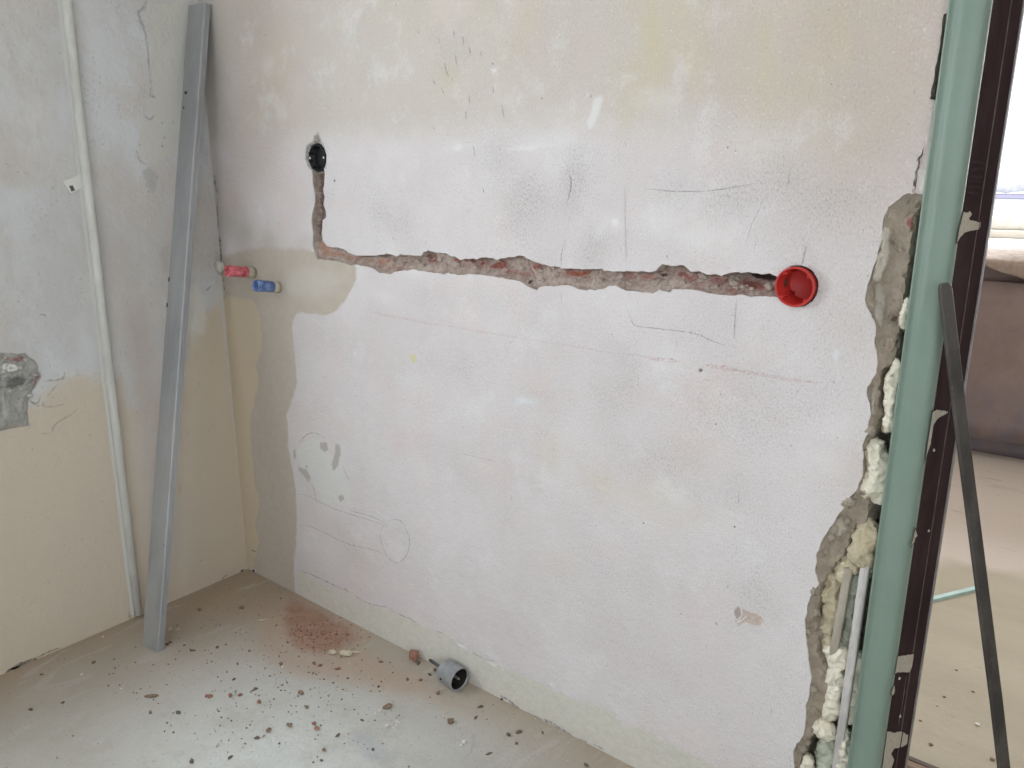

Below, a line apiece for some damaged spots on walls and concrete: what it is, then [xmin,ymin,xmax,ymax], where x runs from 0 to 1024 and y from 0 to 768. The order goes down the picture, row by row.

spalling [930,14,947,100]
spalling [0,352,41,431]
spalling [794,193,923,768]